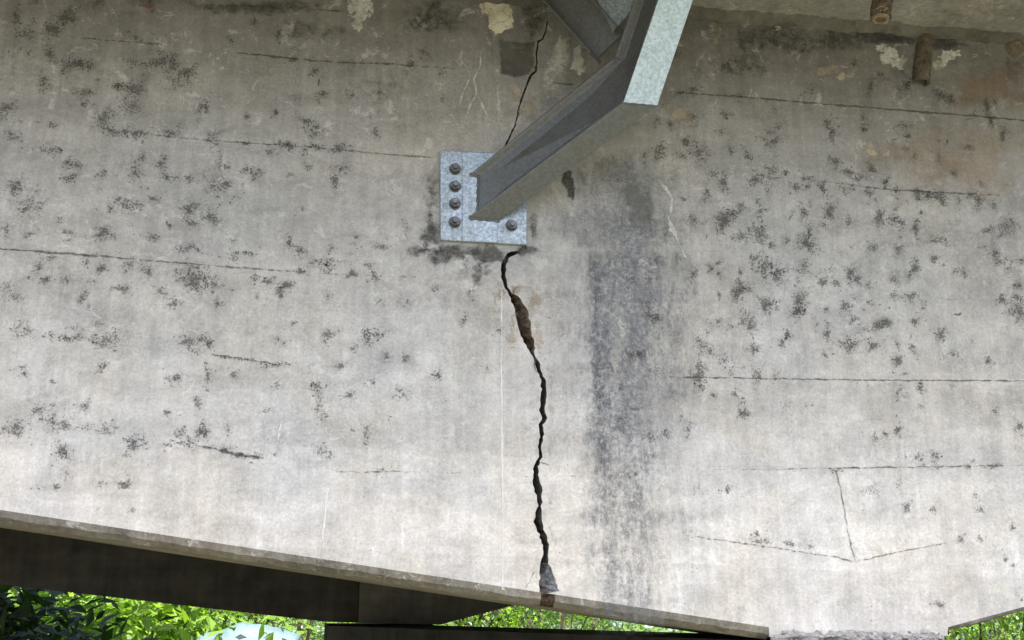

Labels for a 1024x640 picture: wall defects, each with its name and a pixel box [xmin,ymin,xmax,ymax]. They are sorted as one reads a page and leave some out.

crack [505,20,548,145]
leakage [251,239,335,299]
leakage [409,213,506,301]
leakage [591,126,1024,447]
leakage [10,321,130,351]
leakage [180,332,291,410]
leakage [0,397,95,490]
leakage [163,423,275,463]
crack [490,246,559,608]
crack [701,473,941,561]